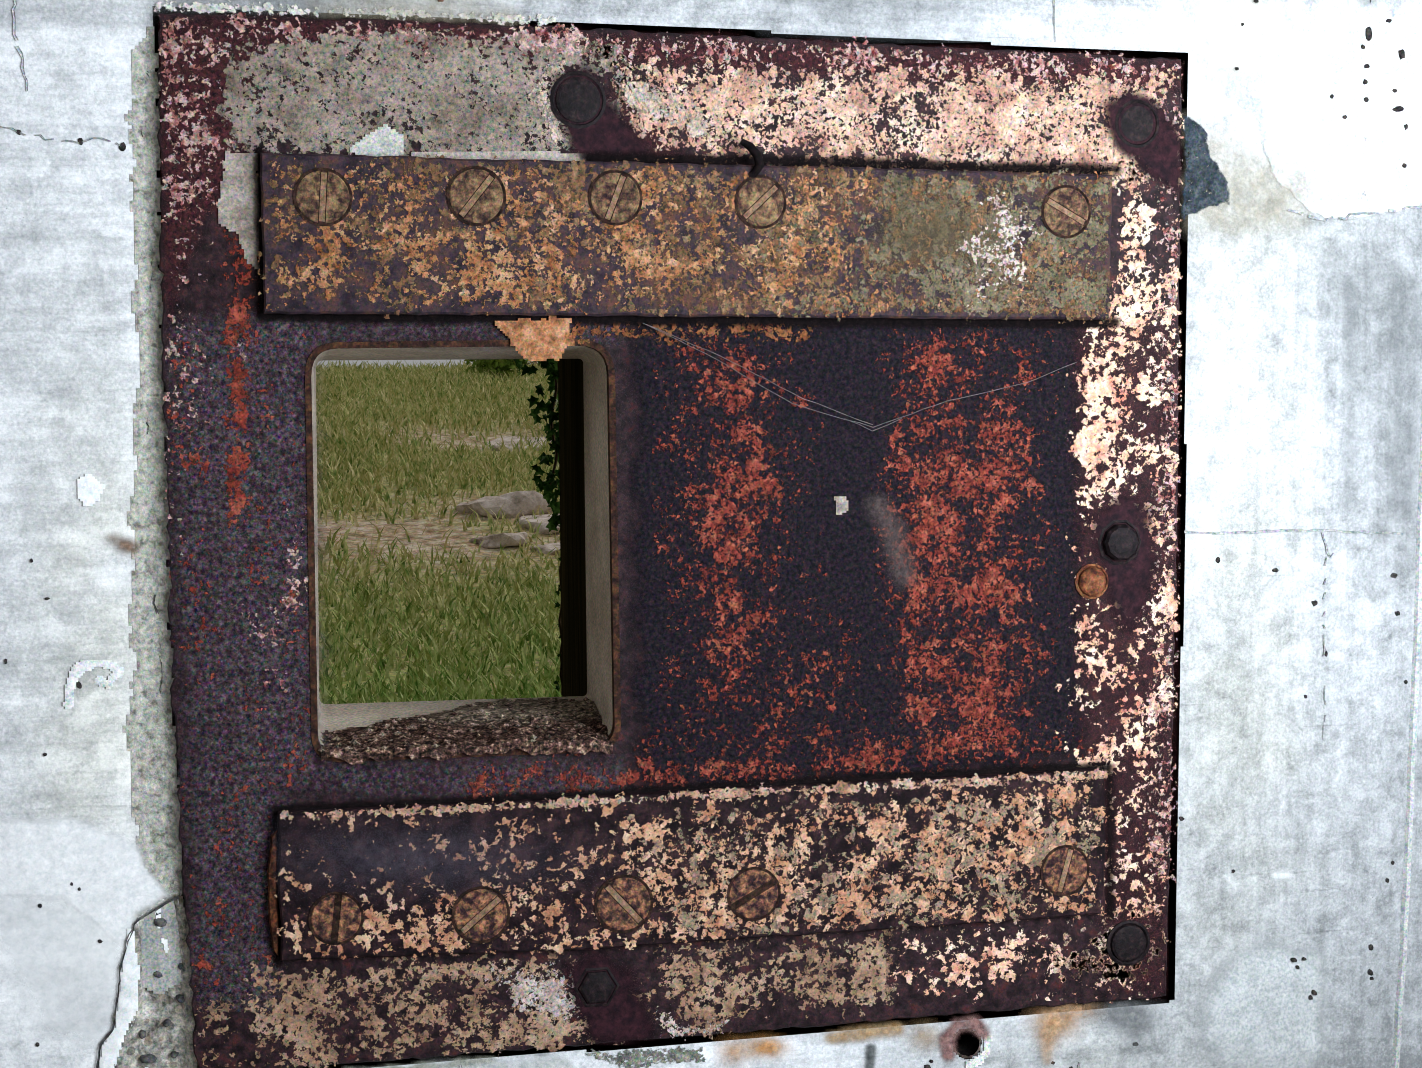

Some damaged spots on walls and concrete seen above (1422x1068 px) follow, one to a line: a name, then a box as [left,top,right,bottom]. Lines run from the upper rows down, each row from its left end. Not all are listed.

crack [12,0,28,91]
crack [0,126,126,151]
corrosion [1107,93,1230,218]
peeling [1184,0,1422,221]
peeling [834,496,848,515]
peeling [230,508,309,647]
corrosion [167,165,1121,1012]
peeling [1068,686,1107,726]
peeling [225,768,1162,1068]
crack [96,896,179,1068]
corrosion [827,1024,903,1068]
corrosion [940,1017,989,1060]